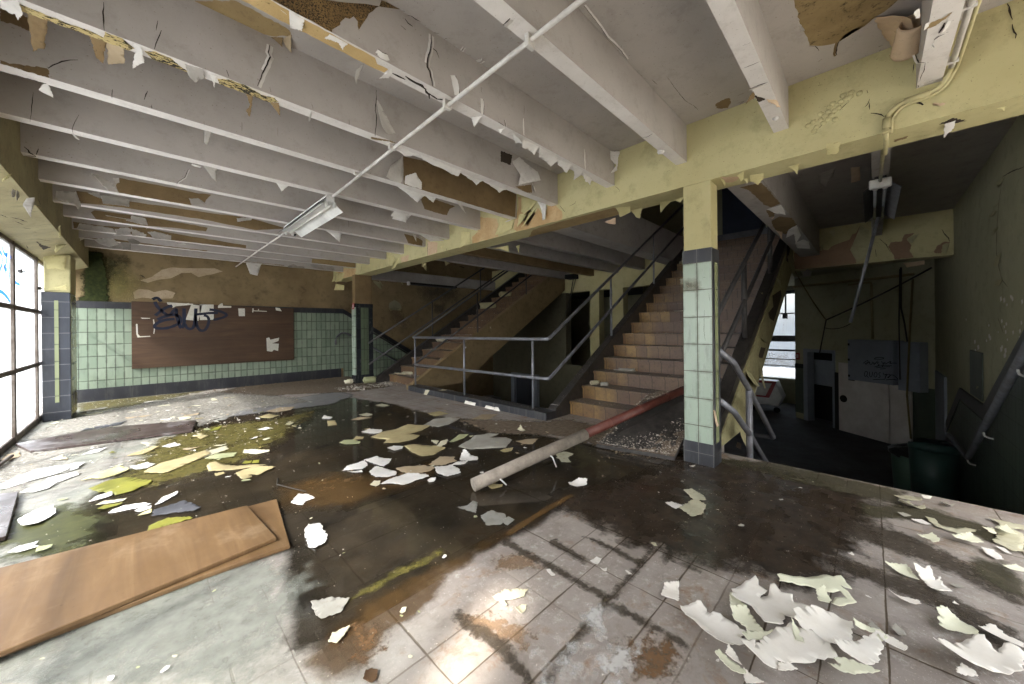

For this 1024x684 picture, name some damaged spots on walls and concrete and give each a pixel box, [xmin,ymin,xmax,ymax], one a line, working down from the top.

peeling [0,0,280,116]
crack [257,44,274,88]
crack [398,8,525,135]
peeling [794,0,953,61]
peeling [2,174,35,217]
peeling [37,173,283,299]
peeling [241,259,356,290]
peeling [371,128,642,253]
peeling [719,172,871,278]
peeling [888,233,950,267]
peeling [746,337,768,397]